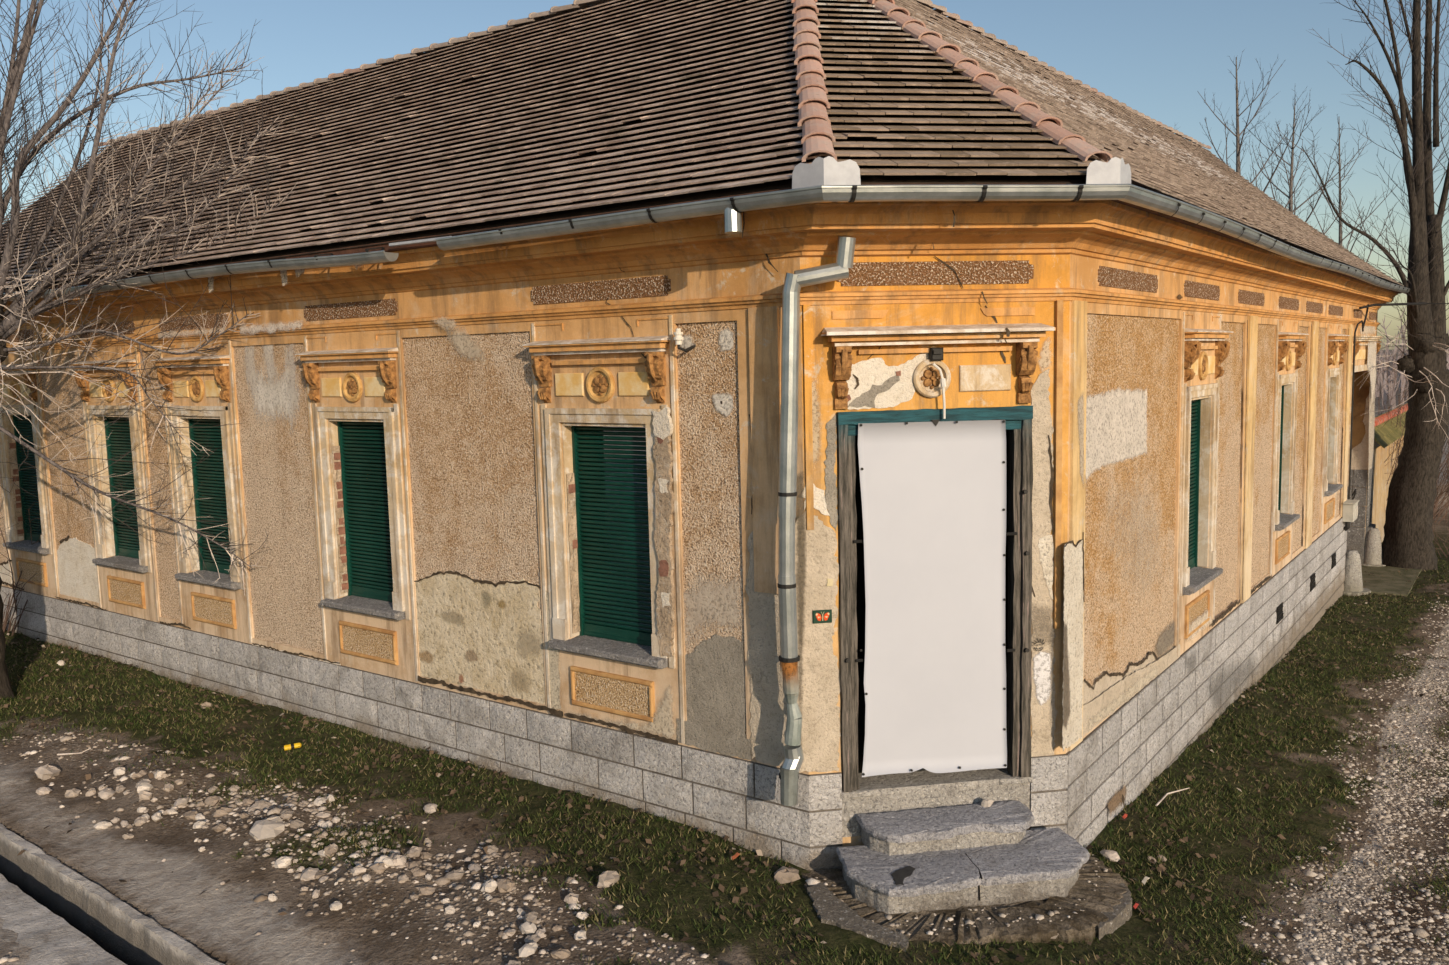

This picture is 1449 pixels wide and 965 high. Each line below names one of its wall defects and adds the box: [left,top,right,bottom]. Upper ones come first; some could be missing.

peeling [803,353,928,529]
peeling [414,571,561,709]
spalling [567,473,580,633]
peeling [579,688,675,738]
flaking render [658,560,669,577]
flaking render [745,531,787,766]
peeling [1038,532,1212,751]